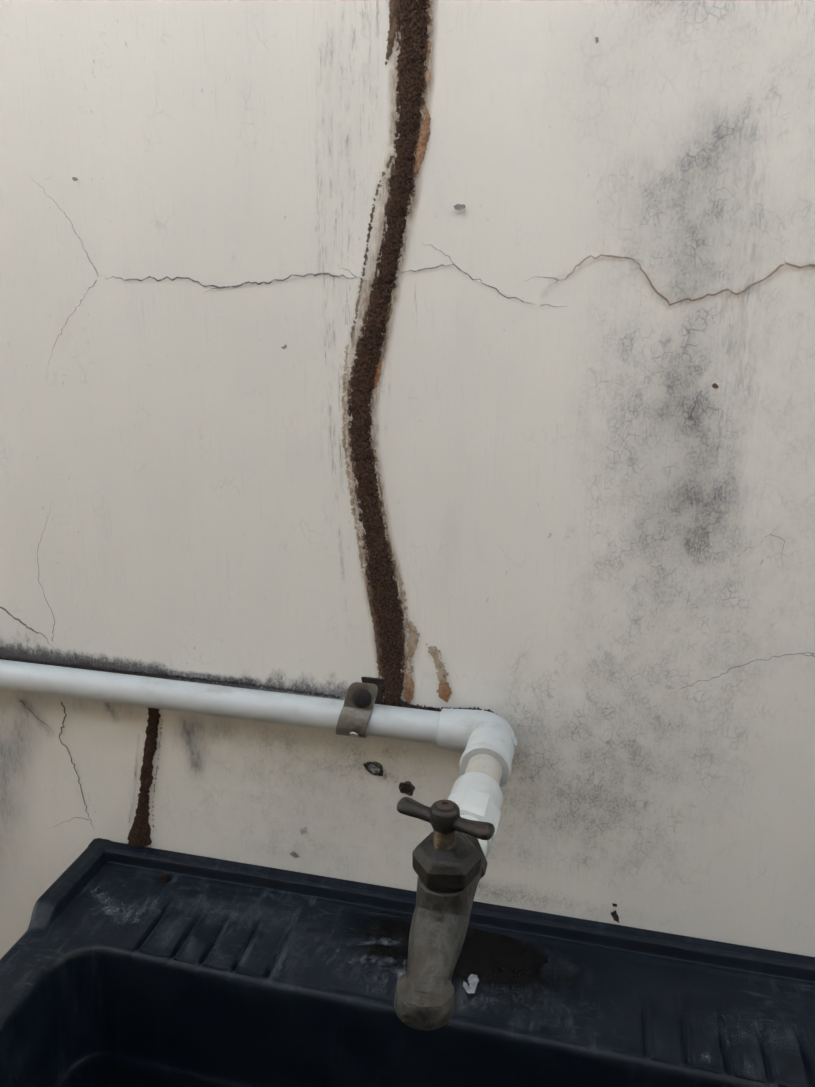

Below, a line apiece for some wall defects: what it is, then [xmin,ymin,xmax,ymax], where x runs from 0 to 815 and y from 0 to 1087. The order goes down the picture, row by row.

crack [38,184,357,366]
crack [409,245,815,307]
crack [0,516,55,642]
water stain [0,647,348,699]
rust [426,644,452,702]